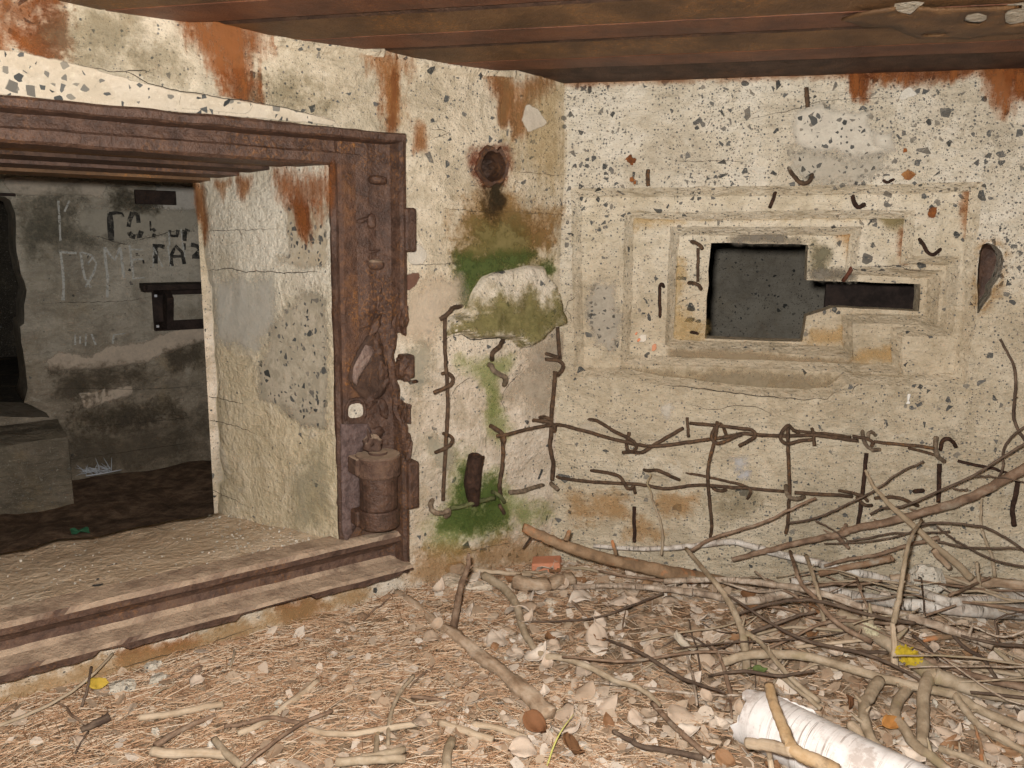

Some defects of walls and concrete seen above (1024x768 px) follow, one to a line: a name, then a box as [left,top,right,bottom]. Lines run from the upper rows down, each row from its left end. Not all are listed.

corrosion [0,0,66,60]
corrosion [185,21,261,102]
corrosion [492,76,552,135]
corrosion [850,70,969,99]
corrosion [985,68,1024,117]
corrosion [195,184,208,239]
corrosion [278,171,335,232]
water stain [464,183,560,248]
spalling [527,336,564,372]
spalling [428,437,453,470]